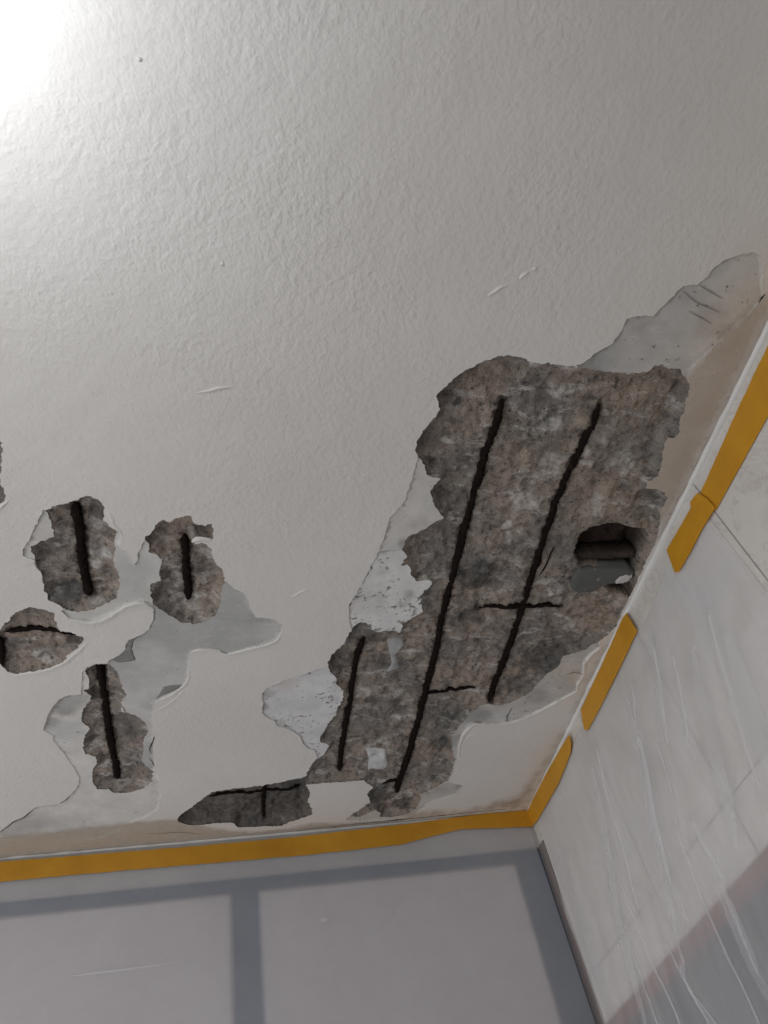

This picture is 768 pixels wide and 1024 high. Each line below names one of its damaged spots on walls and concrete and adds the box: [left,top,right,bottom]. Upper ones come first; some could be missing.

peeling [0,496,284,839]
spalling [177,252,763,827]